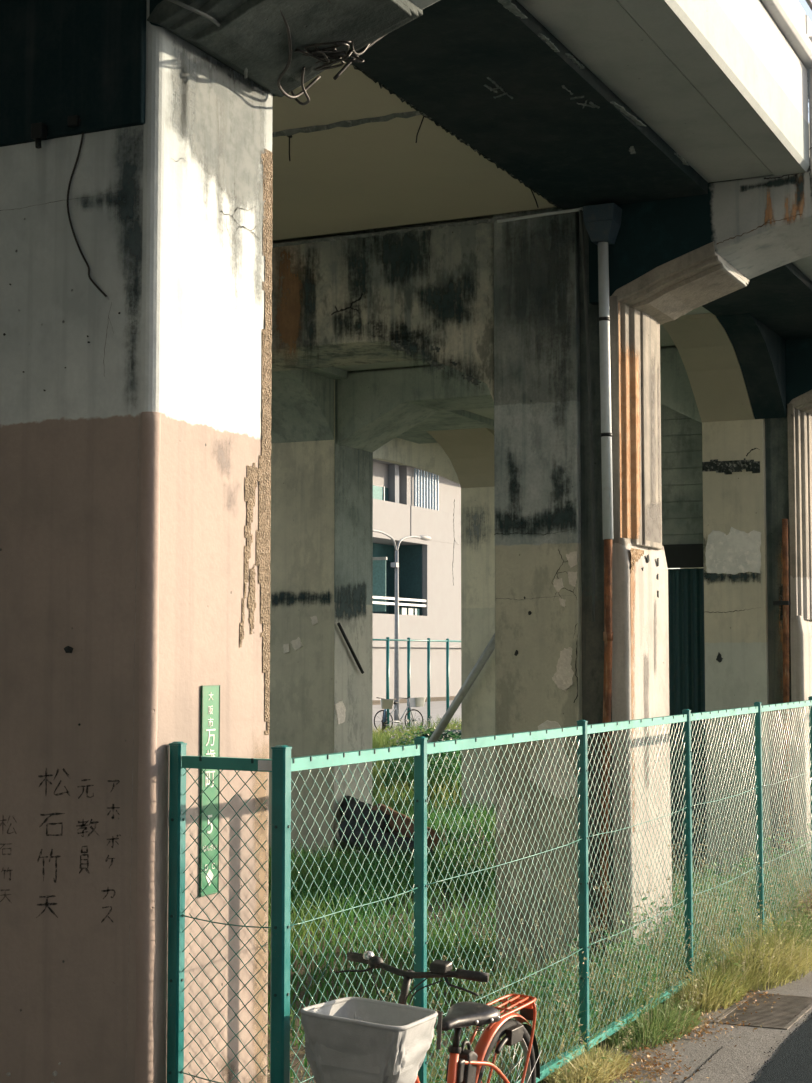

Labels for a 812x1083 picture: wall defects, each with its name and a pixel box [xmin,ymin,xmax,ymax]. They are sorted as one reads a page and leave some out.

leakage [170,49,266,299]
leakage [302,249,319,356]
leakage [334,230,478,379]
spalling [240,148,273,735]
rust [619,331,641,539]
leakage [271,582,366,620]
leakage [466,453,576,542]
peeling [553,551,577,607]
peeling [705,527,761,575]
peeling [552,647,574,691]